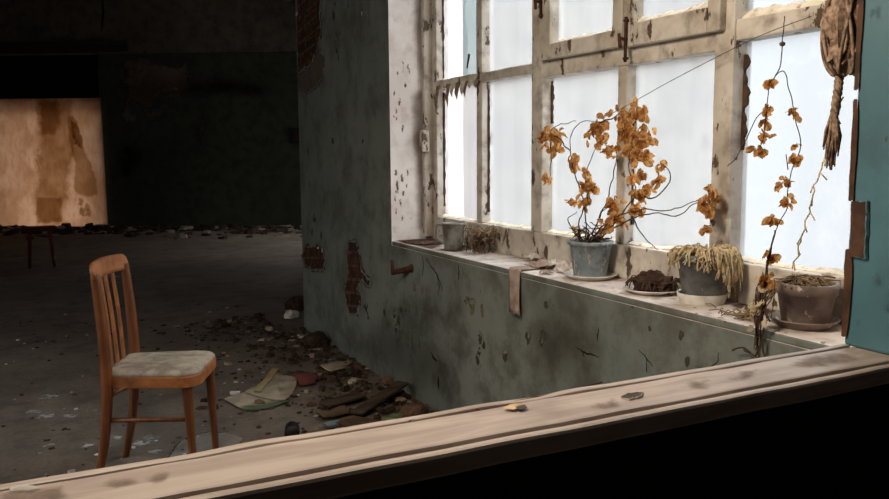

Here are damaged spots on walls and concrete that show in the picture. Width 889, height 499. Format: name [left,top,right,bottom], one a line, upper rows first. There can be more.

spalling [295,0,325,95]
spalling [301,214,326,273]
spalling [343,238,372,318]